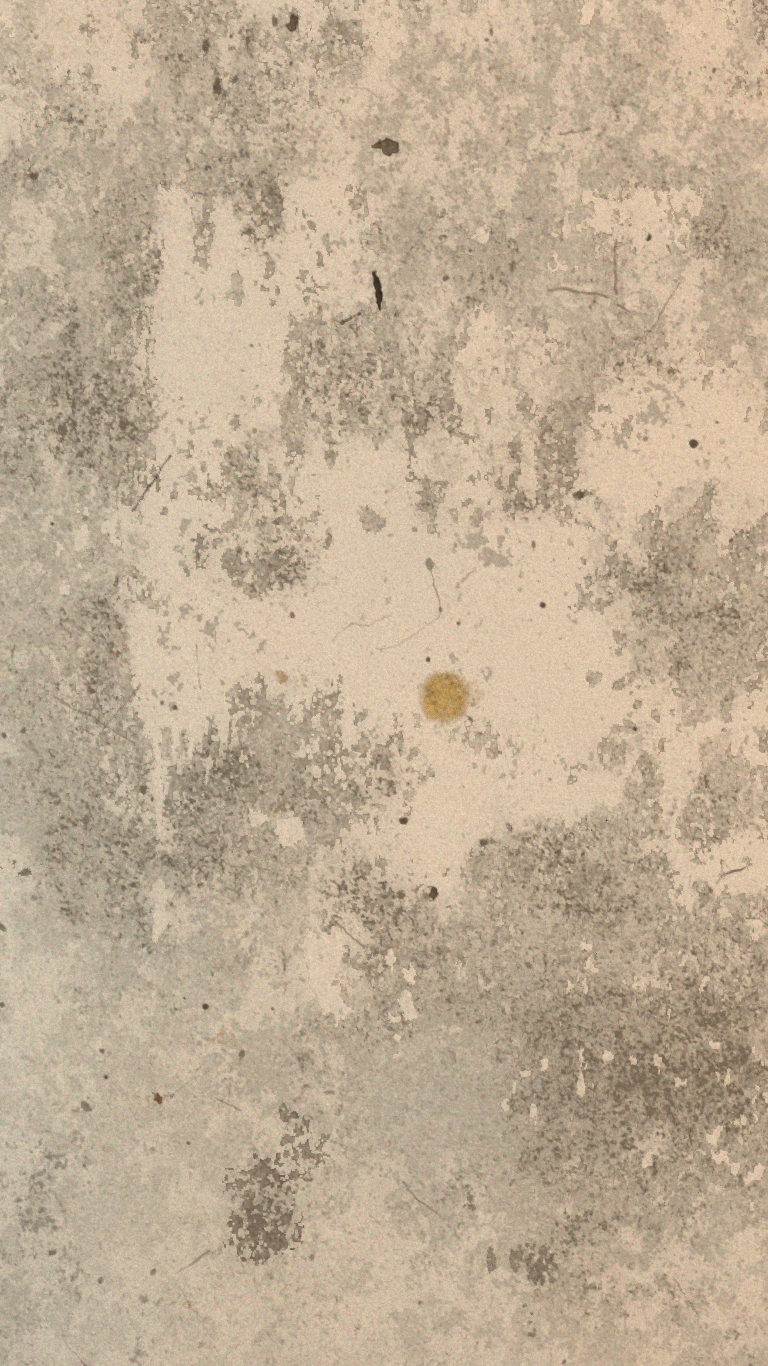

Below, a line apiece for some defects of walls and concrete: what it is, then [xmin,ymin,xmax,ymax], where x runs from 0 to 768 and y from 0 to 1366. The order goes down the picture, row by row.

rust [424,674,468,719]